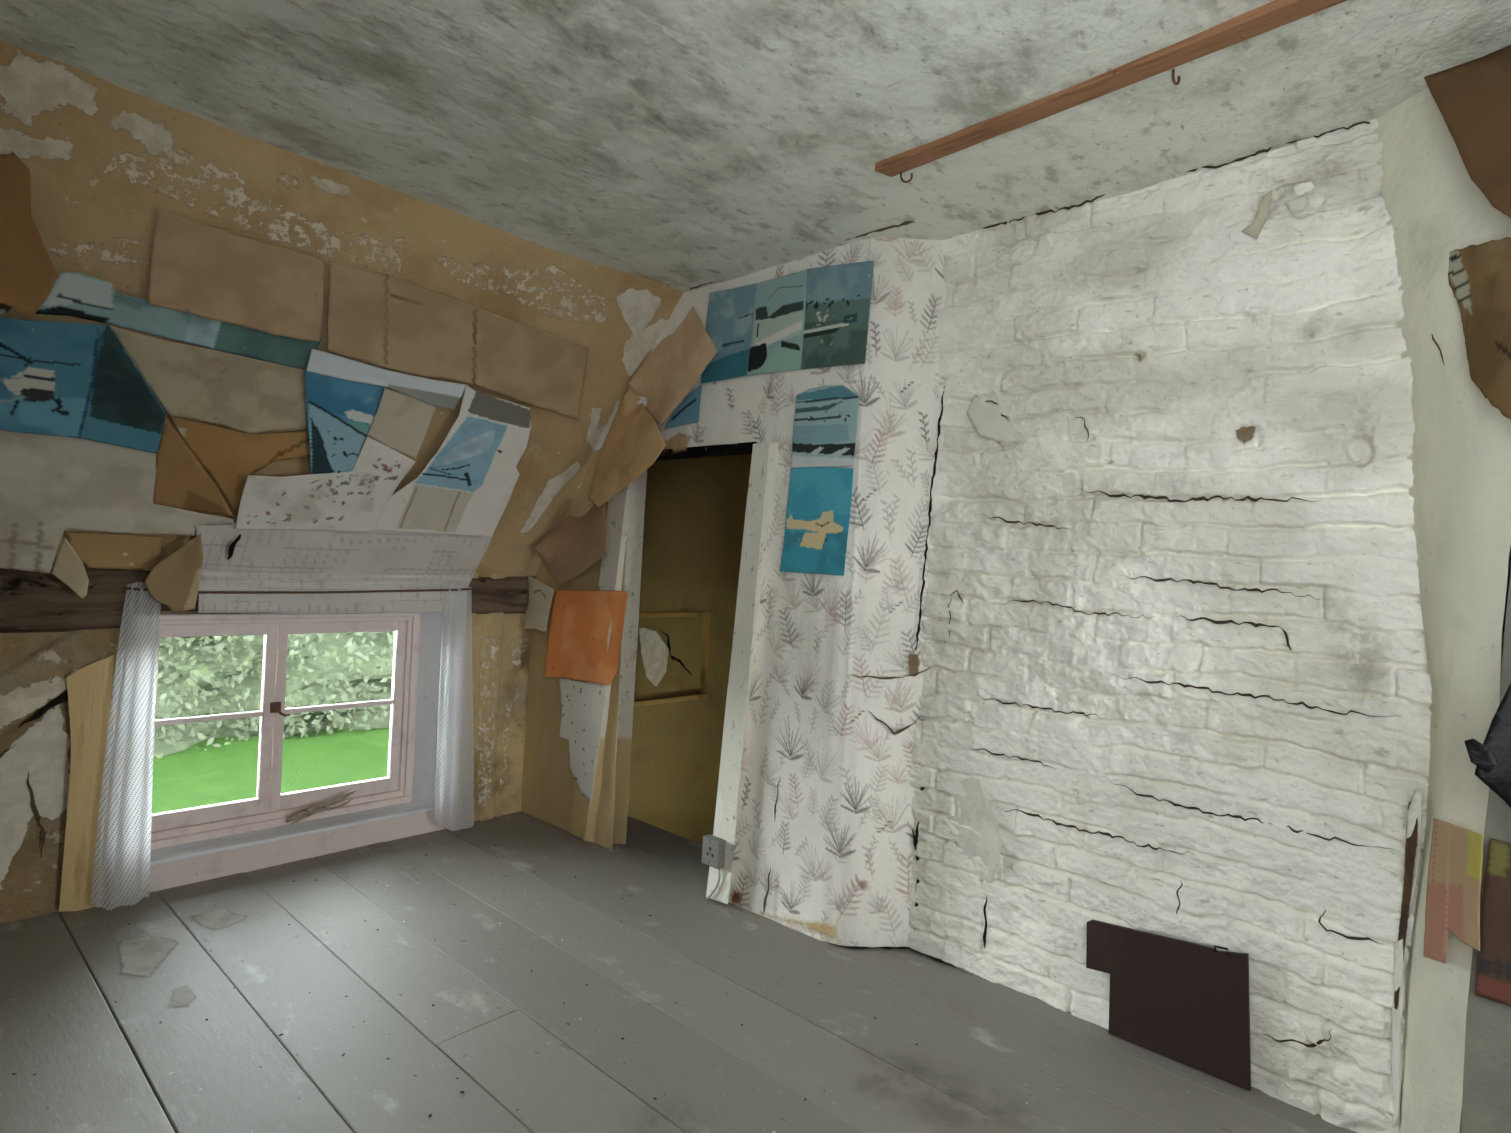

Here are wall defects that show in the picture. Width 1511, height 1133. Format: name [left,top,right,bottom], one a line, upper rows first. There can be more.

peeling [0,49,406,275]
crack [983,194,1105,229]
crack [1186,121,1370,172]
peeling [520,400,621,533]
crack [852,386,1321,735]
flaking render [639,627,669,687]
flaking render [0,669,80,890]